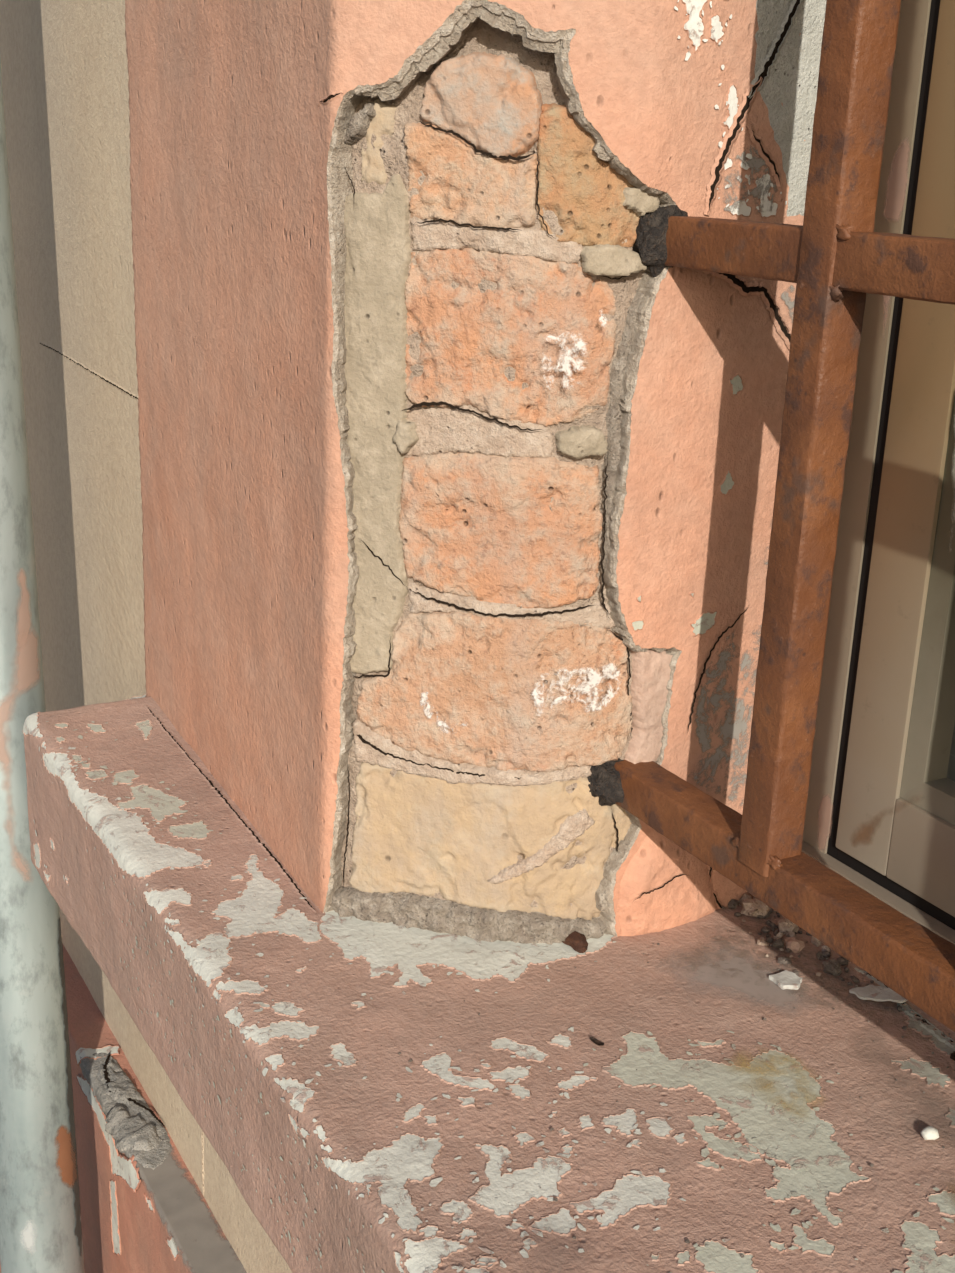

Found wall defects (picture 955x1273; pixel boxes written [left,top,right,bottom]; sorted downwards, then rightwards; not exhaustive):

peeling [674,0,732,61]
crack [704,0,804,216]
flaking render [715,0,826,219]
crack [696,270,792,350]
flaking render [23,0,682,1049]
crack [687,606,749,733]
peeling [693,625,762,806]
crack [854,968,955,1050]
peeling [890,1004,955,1090]
peeling [74,1045,247,1273]
peeling [257,1030,871,1273]
peeling [881,1184,955,1273]